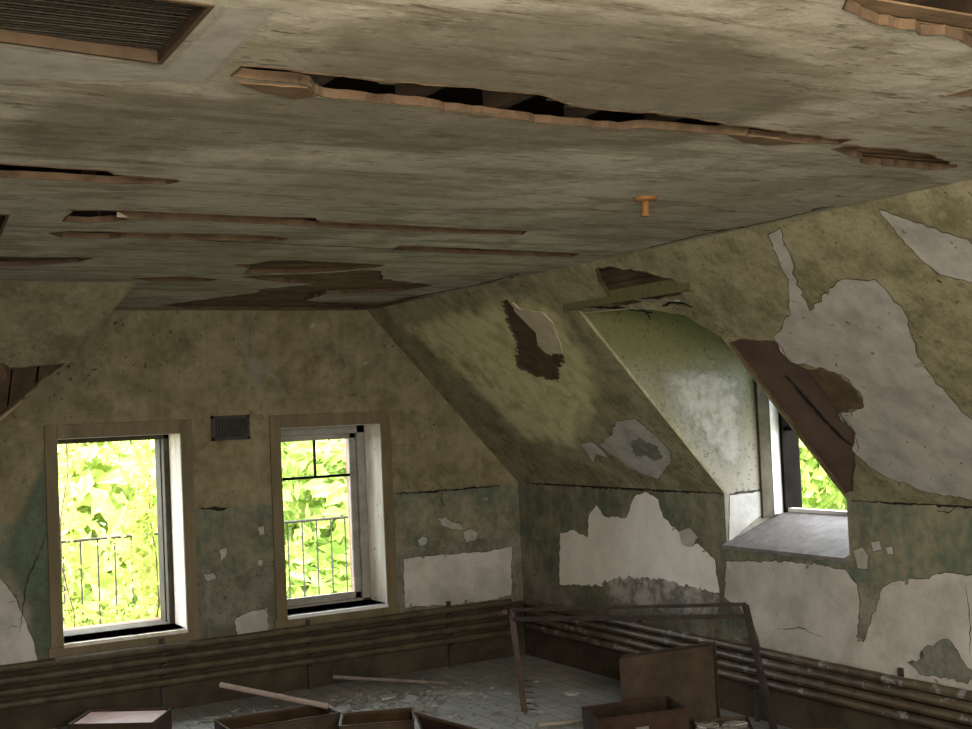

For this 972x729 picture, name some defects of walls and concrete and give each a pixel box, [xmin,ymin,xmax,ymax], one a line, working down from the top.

spalling [595,266,682,307]
peeling [878,209,972,283]
spalling [0,363,65,421]
spalling [501,300,565,382]
peeling [729,228,972,500]
peeling [580,418,672,479]
peeling [0,578,38,665]
peeling [403,516,513,608]
peeling [559,491,972,691]